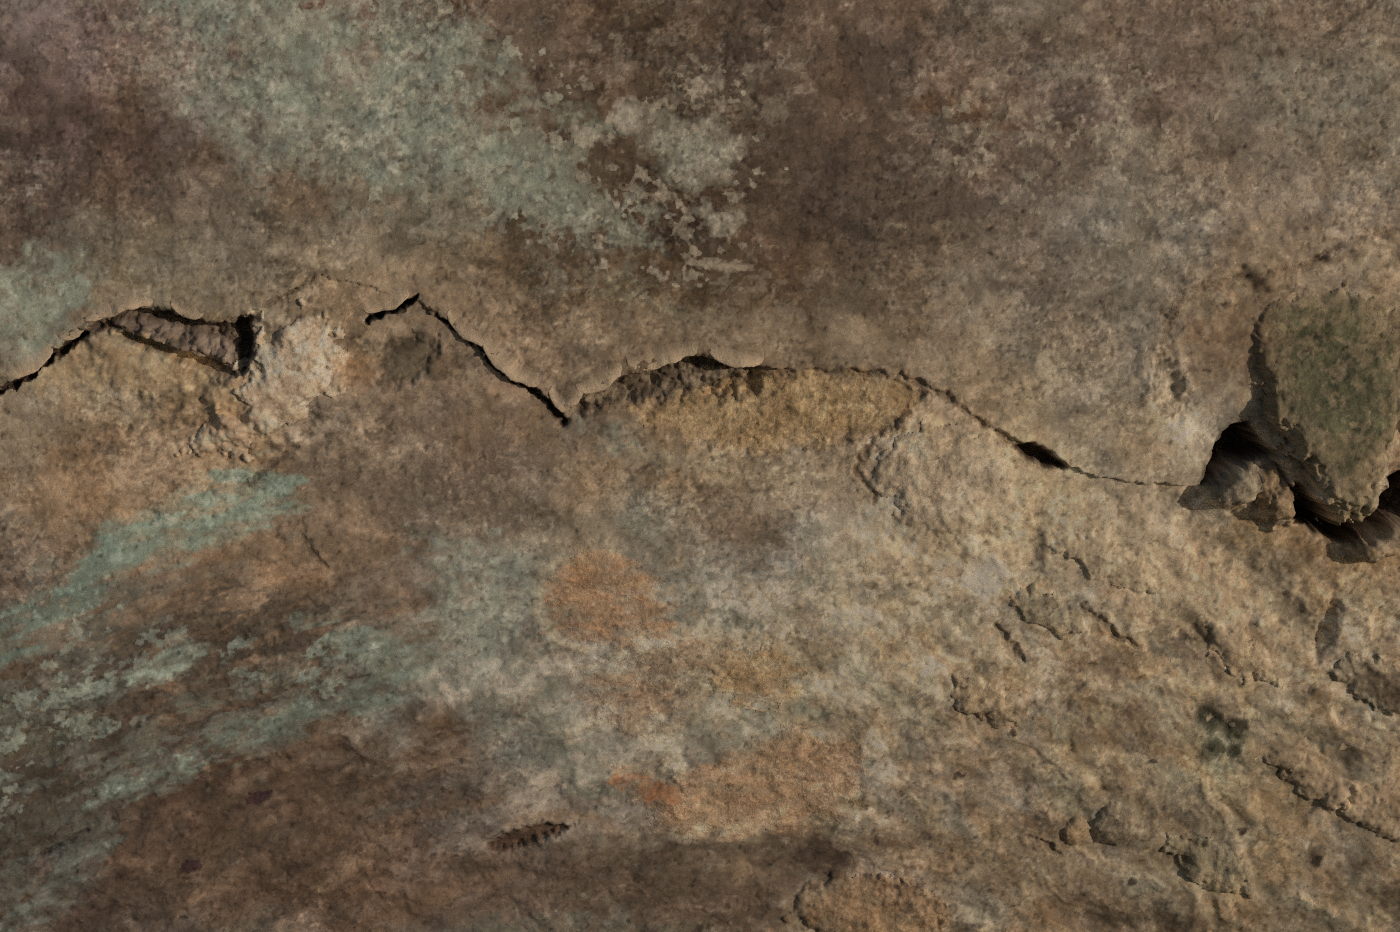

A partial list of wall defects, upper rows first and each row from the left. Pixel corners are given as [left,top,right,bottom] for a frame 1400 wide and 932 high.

crack [0,295,204,395]
crack [246,269,328,326]
crack [361,285,765,428]
crack [1151,230,1390,391]
crack [243,429,315,487]
crack [843,367,1020,512]
crack [299,516,329,570]